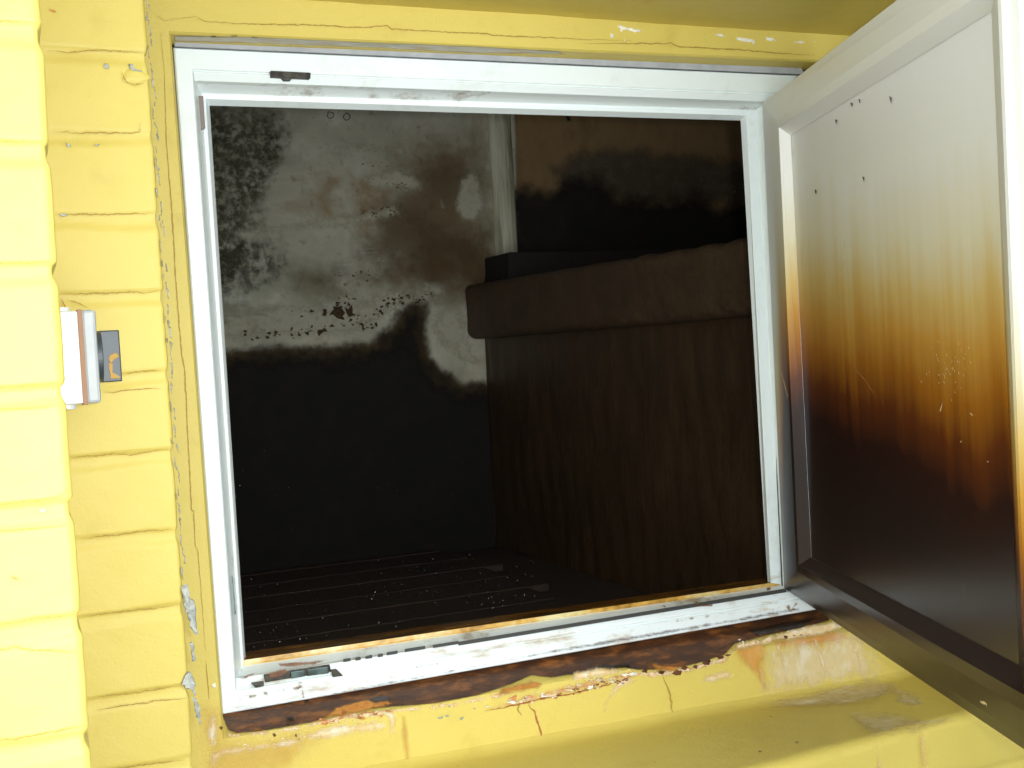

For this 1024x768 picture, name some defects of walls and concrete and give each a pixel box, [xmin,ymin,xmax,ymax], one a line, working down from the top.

crack [158,16,814,55]
peeling [714,34,776,44]
peeling [128,0,201,724]
crack [0,50,209,741]
water stain [210,604,829,762]
peeling [438,672,638,720]
water stain [782,684,920,705]
peeling [311,710,393,725]
crack [517,704,542,736]